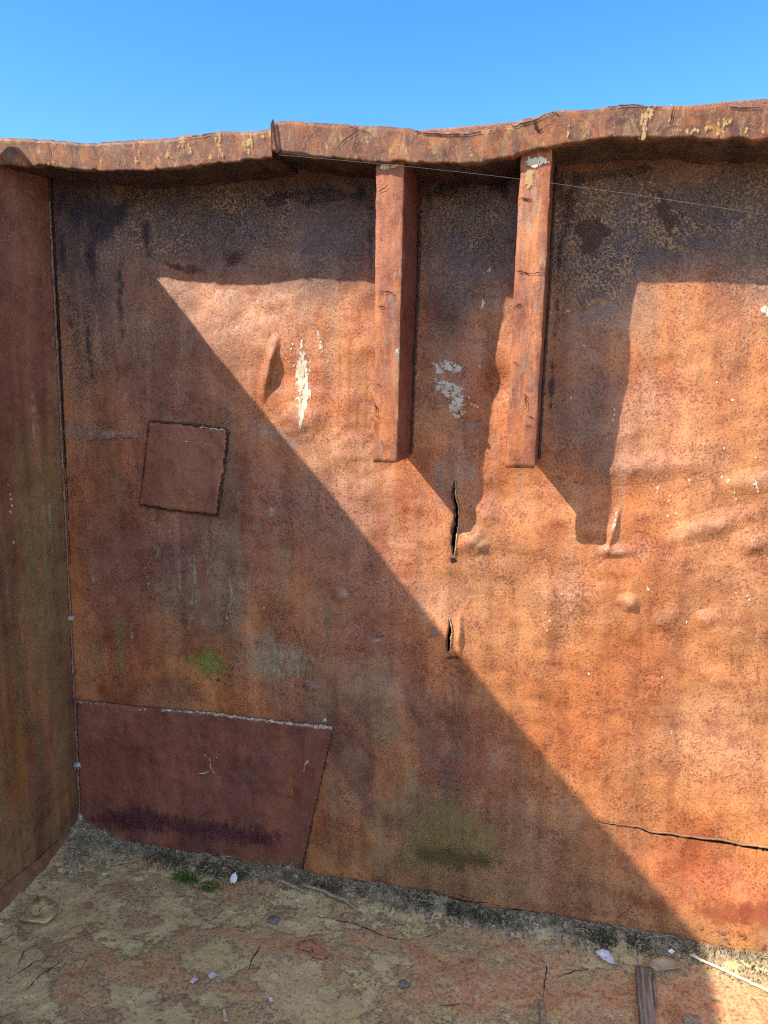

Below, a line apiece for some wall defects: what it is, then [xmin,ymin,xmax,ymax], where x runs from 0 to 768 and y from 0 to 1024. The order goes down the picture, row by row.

peeling [285,331,329,440]
peeling [433,360,479,421]
crack [450,480,460,563]
crack [446,618,458,660]
water stain [98,807,280,845]
crack [599,821,768,851]